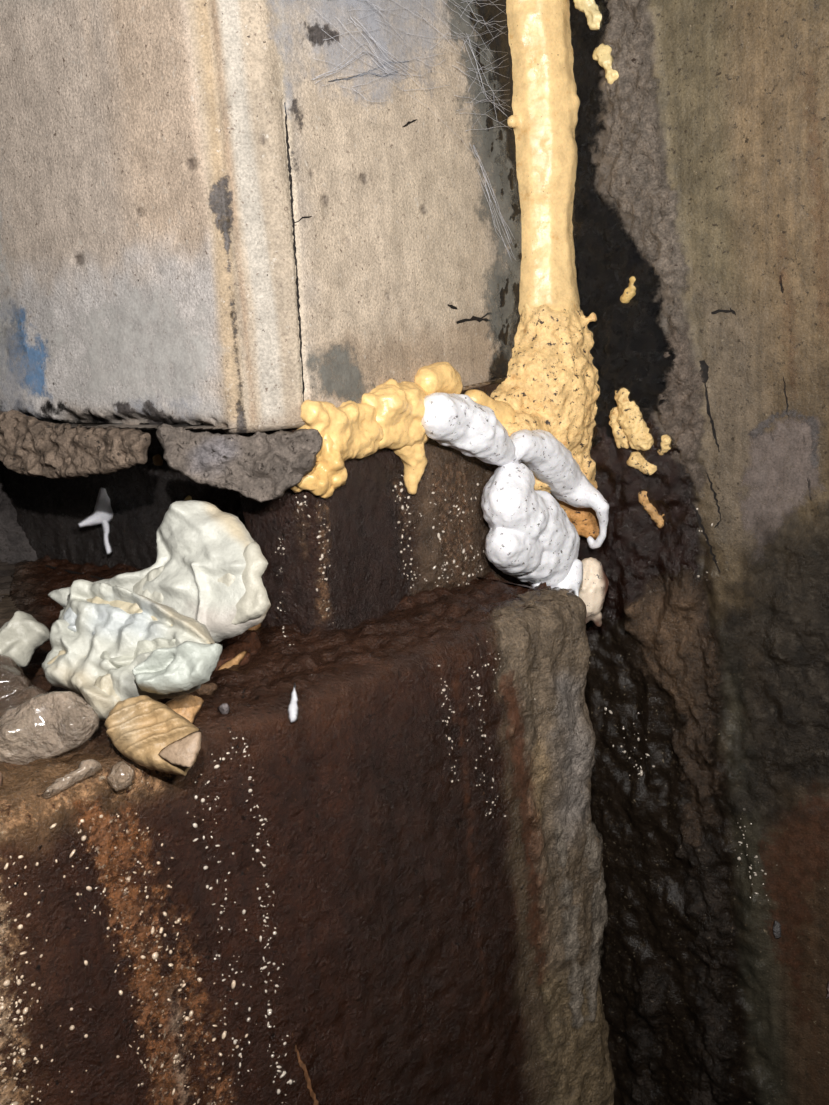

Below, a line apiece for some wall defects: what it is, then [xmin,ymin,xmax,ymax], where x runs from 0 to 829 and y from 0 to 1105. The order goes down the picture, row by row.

crack [284,102,312,401]
damp [569,0,707,637]
damp [0,761,172,840]
damp [0,875,29,1105]